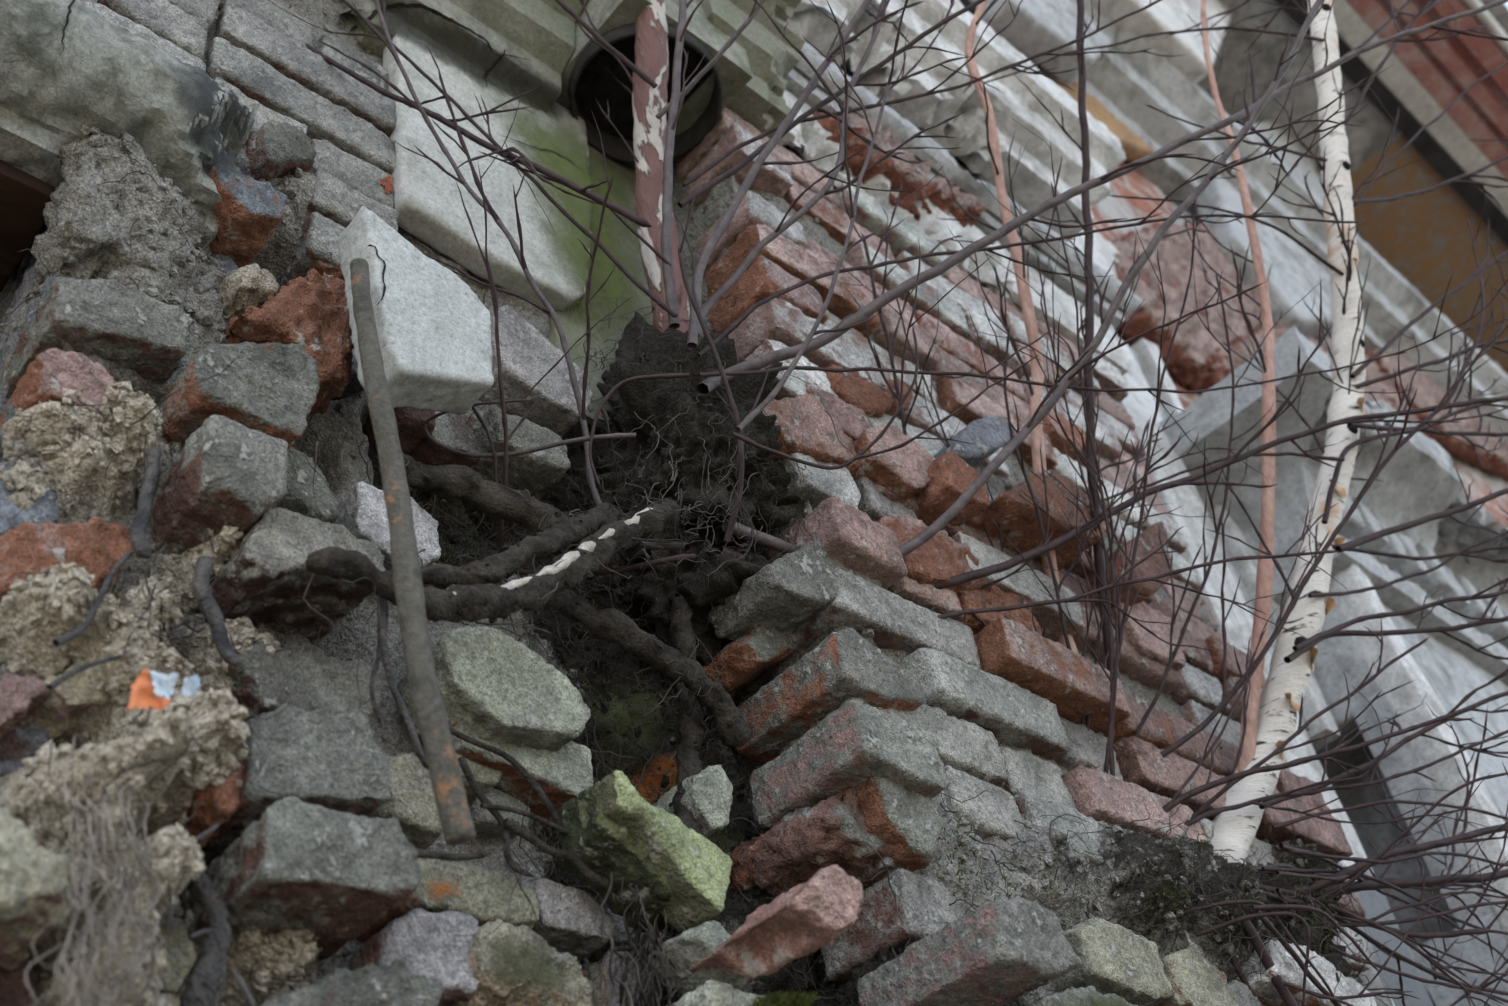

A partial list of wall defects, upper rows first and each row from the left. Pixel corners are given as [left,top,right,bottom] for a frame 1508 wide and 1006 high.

spalling [380,175,394,194]